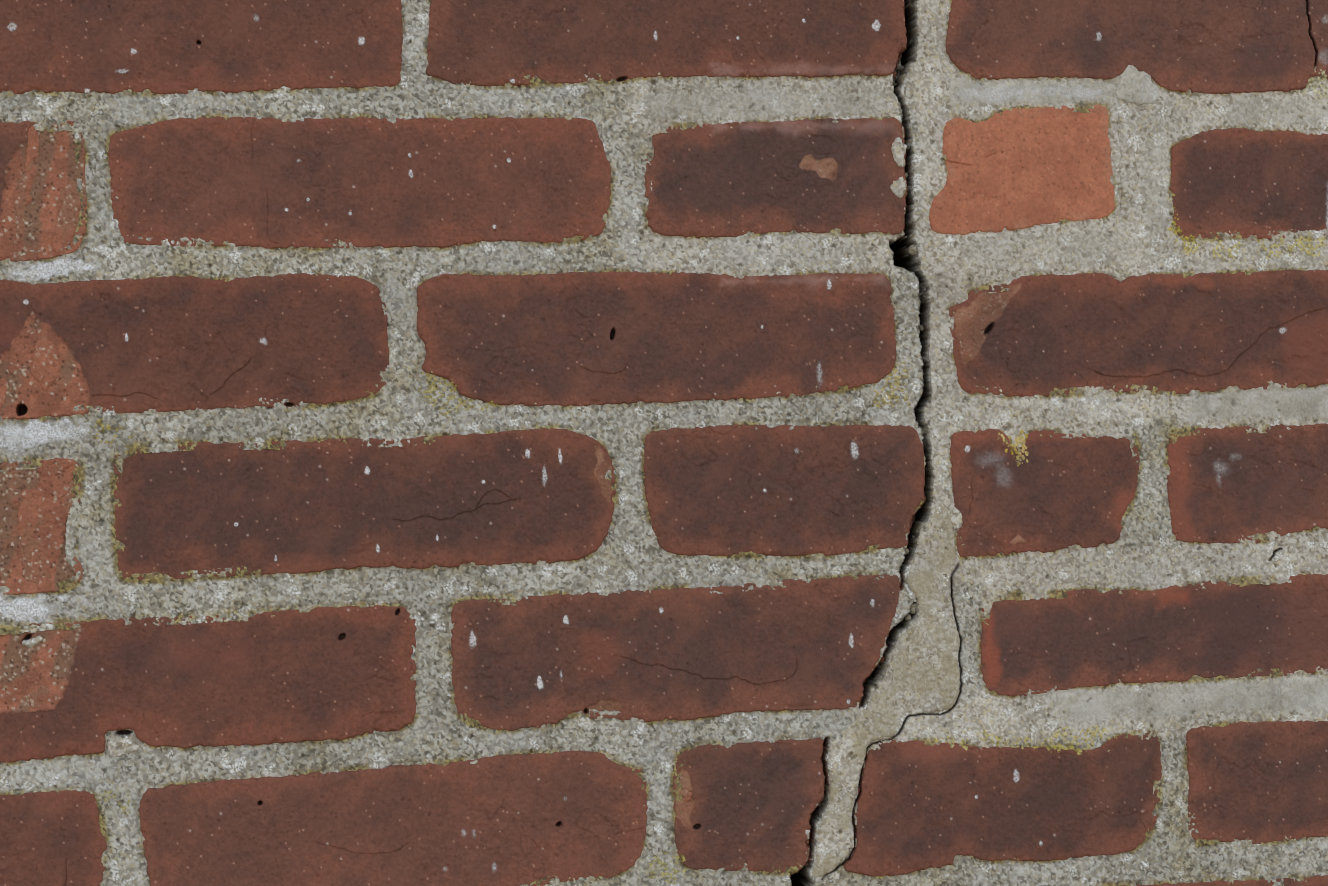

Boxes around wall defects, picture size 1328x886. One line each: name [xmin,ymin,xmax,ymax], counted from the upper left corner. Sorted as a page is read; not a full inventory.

spalling [0,120,87,262]
spalling [0,311,91,420]
crack [858,0,935,712]
crack [1094,309,1321,378]
crack [620,656,798,685]
crack [789,564,963,886]